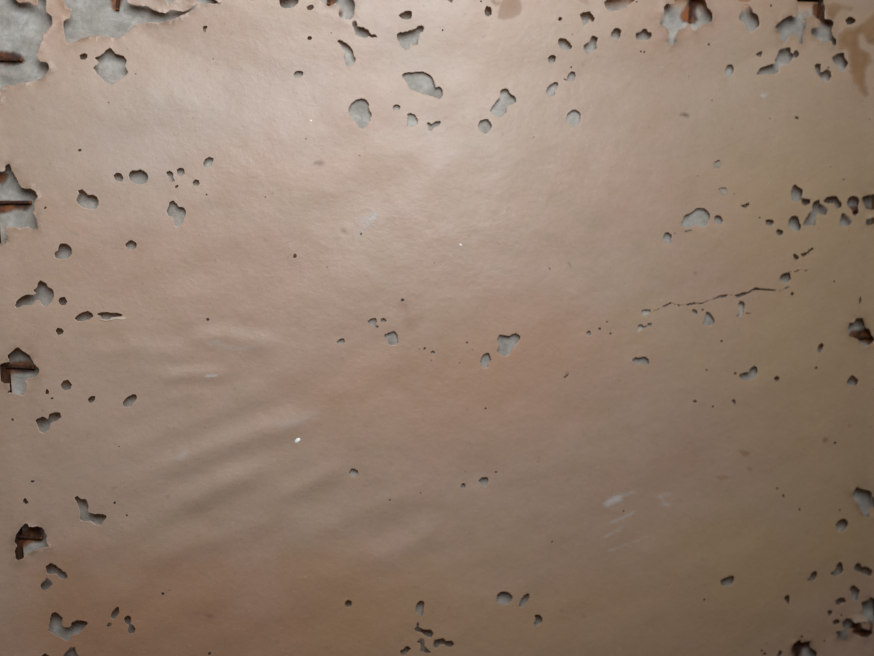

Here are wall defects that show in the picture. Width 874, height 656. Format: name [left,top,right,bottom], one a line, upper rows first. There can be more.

corrosion [681,0,702,23]
corrosion [0,52,24,65]
water stain [844,23,874,83]
corrosion [0,204,30,213]
corrosion [849,329,871,343]